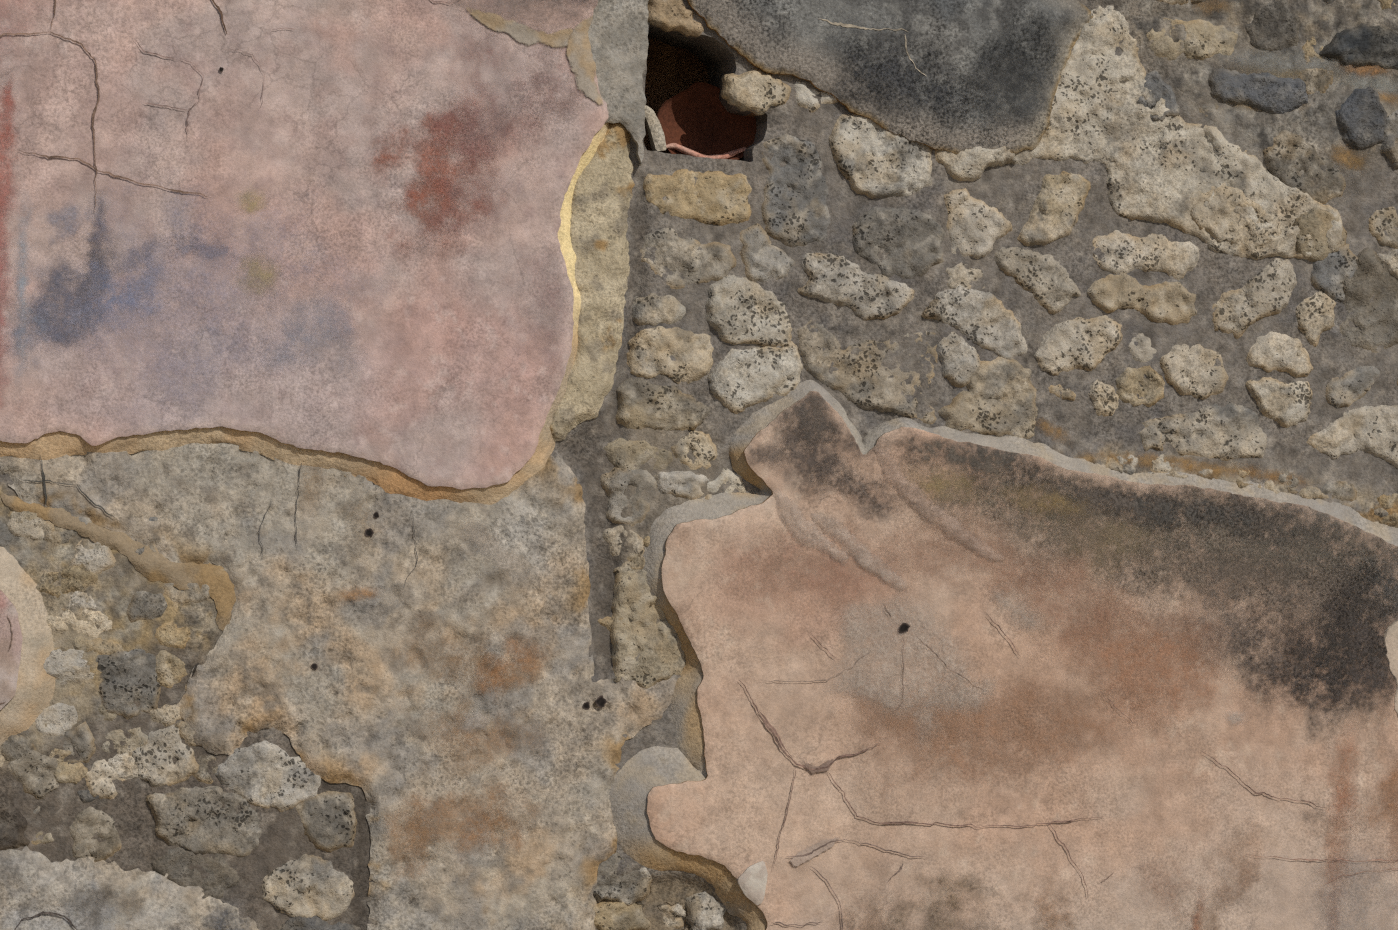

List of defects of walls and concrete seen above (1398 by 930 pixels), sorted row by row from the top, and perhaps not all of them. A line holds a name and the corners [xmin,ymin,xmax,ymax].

crack [0,0,211,212]
crack [133,0,293,139]
leakage [907,437,1398,724]
crack [739,605,1113,930]